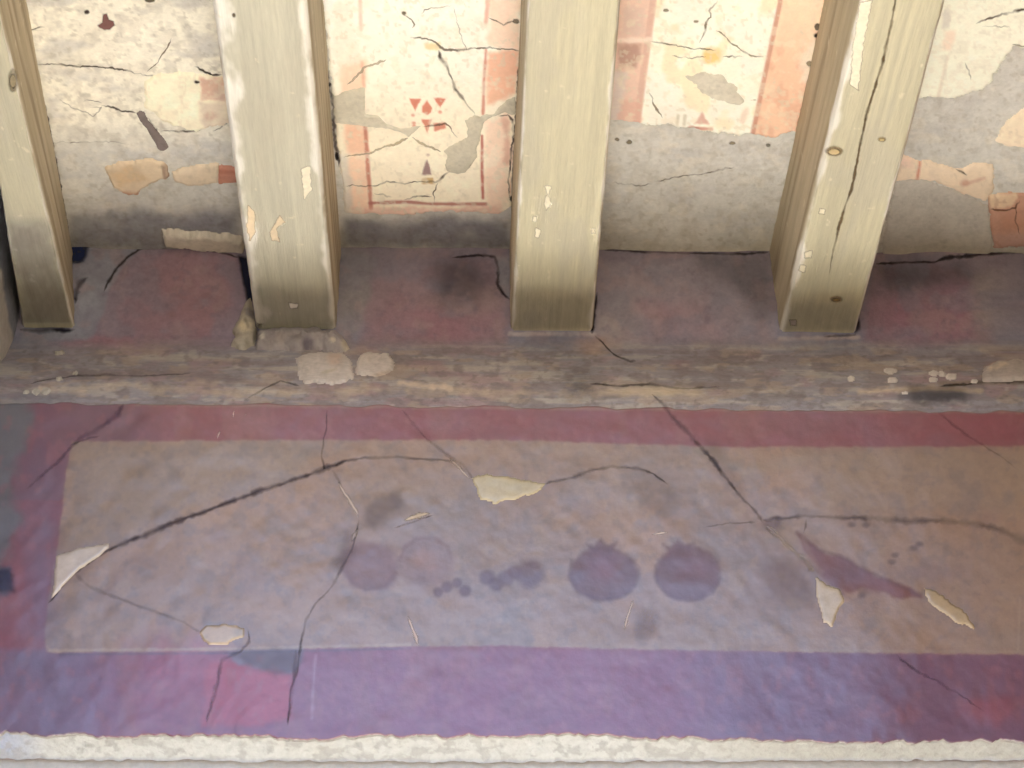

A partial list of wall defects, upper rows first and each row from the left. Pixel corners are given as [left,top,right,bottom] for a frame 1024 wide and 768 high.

crack [43,42,170,71]
crack [348,60,384,84]
crack [408,8,517,99]
crack [346,123,452,197]
crack [501,115,514,193]
crack [454,254,509,299]
crack [87,462,358,565]
spalling [472,474,546,504]
crack [704,451,737,492]
spalling [52,544,109,598]
spalling [815,577,844,627]
spalling [924,588,975,629]